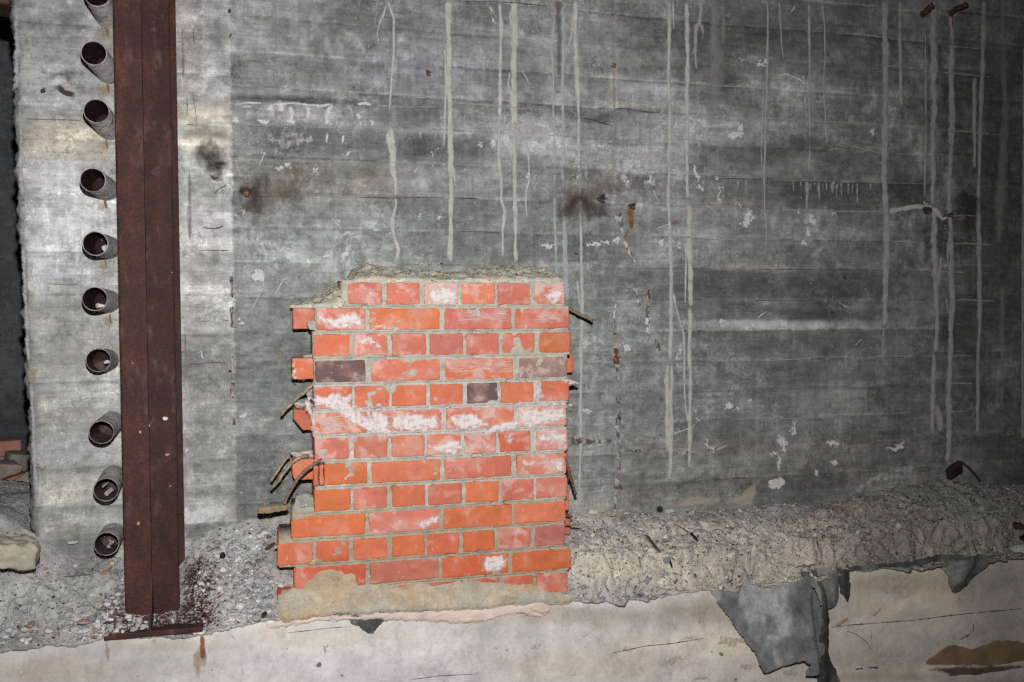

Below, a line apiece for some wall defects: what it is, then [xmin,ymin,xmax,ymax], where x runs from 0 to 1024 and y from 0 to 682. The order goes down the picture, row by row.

efflorescence [305,1,585,504]
damp [633,1,704,479]
damp [761,2,784,252]
efflorescence [808,4,828,172]
efflorescence [881,1,903,359]
efflorescence [924,1,956,462]
efflorescence [972,1,987,433]